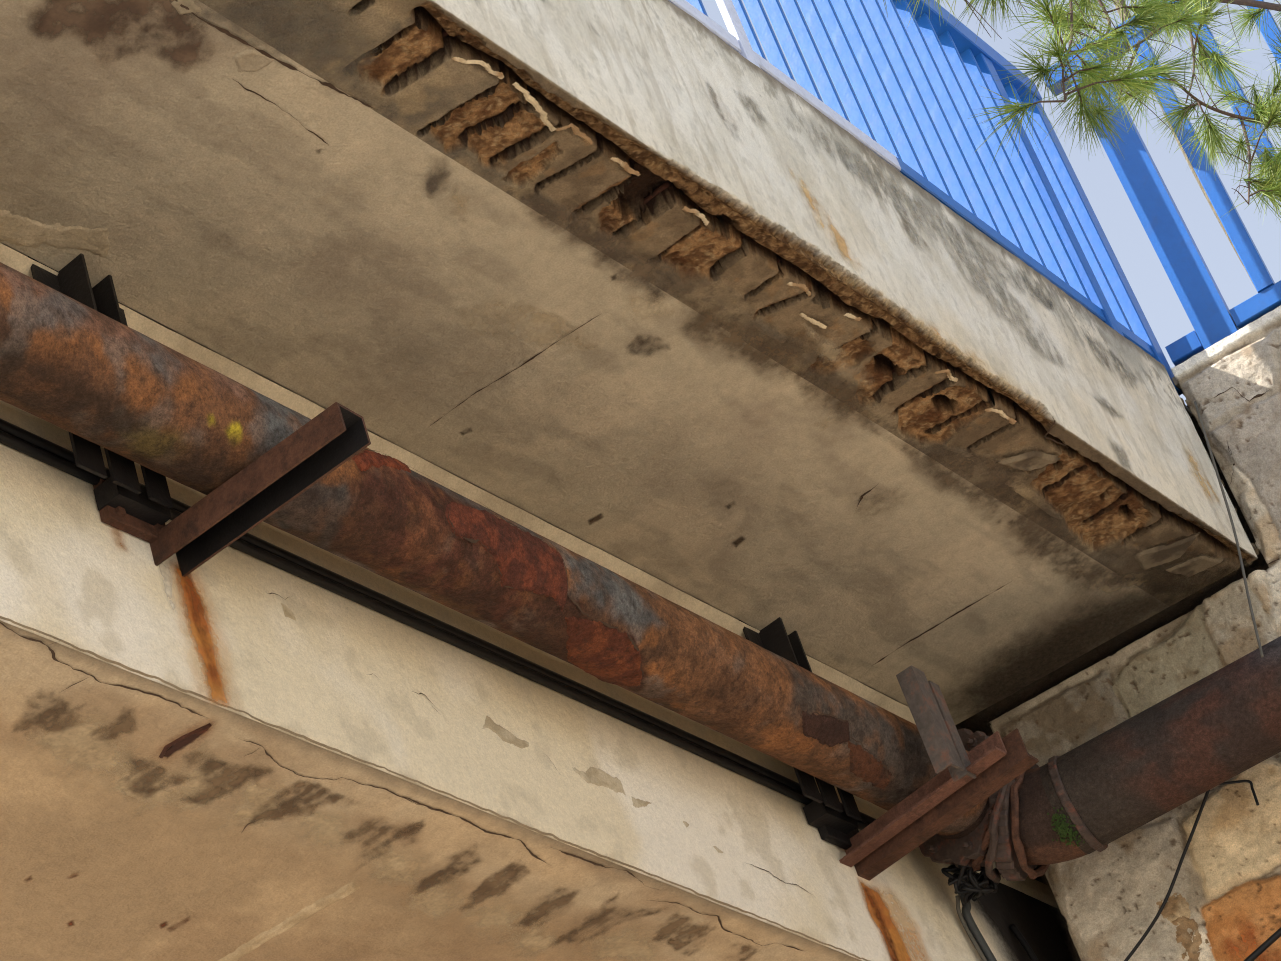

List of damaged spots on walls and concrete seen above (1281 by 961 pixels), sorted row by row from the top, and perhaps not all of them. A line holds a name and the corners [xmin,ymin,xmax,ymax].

water stain [33,0,203,67]
peeling [171,0,203,15]
peeling [234,48,275,73]
crack [175,0,381,112]
crack [233,79,328,144]
peeling [354,2,1257,577]
corrosion [176,568,227,703]
peeling [482,716,529,749]
crack [0,622,803,951]
peeling [572,767,652,808]
water stain [15,700,707,959]
corrosion [861,883,926,961]